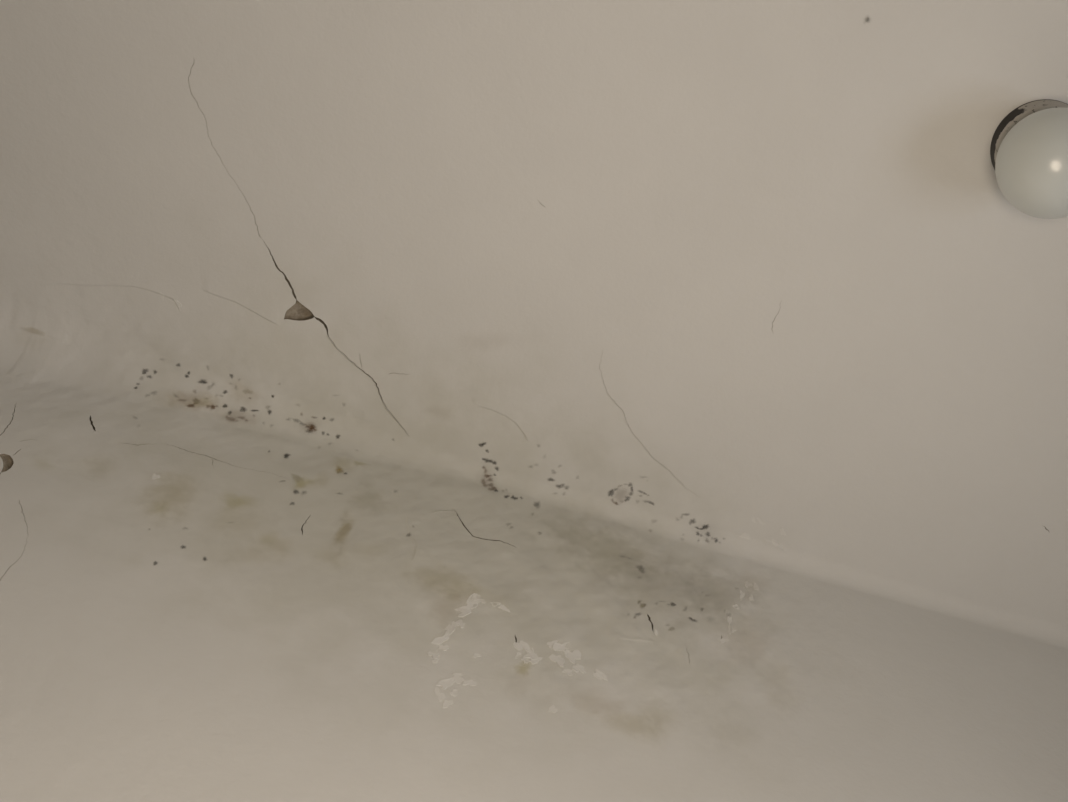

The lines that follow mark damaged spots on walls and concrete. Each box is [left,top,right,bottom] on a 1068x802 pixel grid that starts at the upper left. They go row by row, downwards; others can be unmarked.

crack [188,64,410,435]
spalling [284,300,314,321]
crack [435,510,515,547]